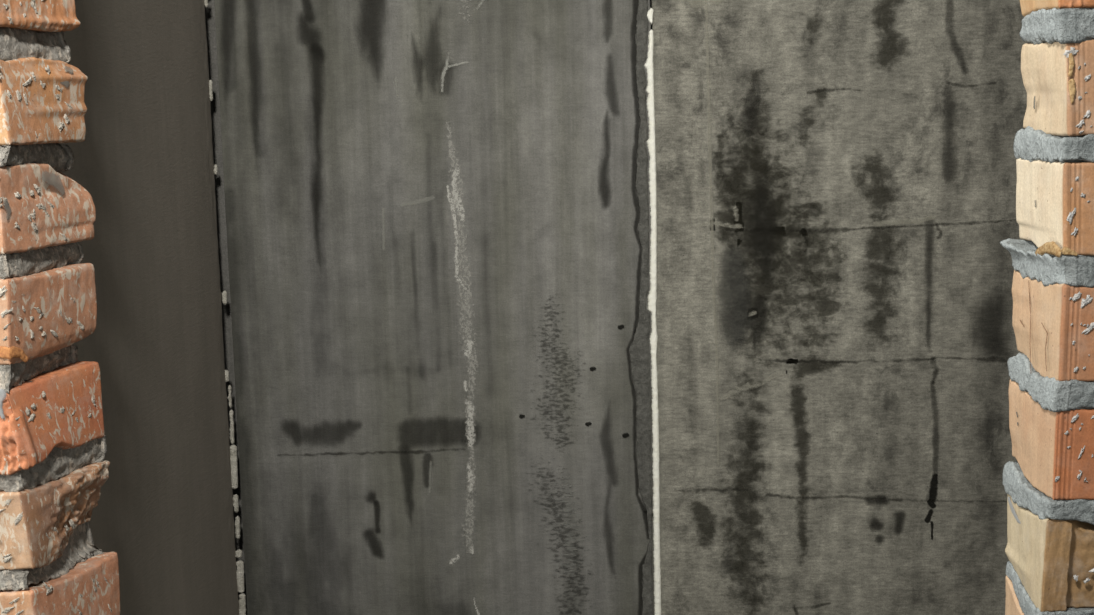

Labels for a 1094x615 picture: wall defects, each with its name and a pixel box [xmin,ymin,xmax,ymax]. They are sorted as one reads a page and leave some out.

water stain [300,0,322,137]
water stain [362,0,383,68]
water stain [873,0,903,66]
water stain [716,100,839,345]
water stain [401,123,478,564]
water stain [693,380,764,605]
water stain [791,358,836,550]